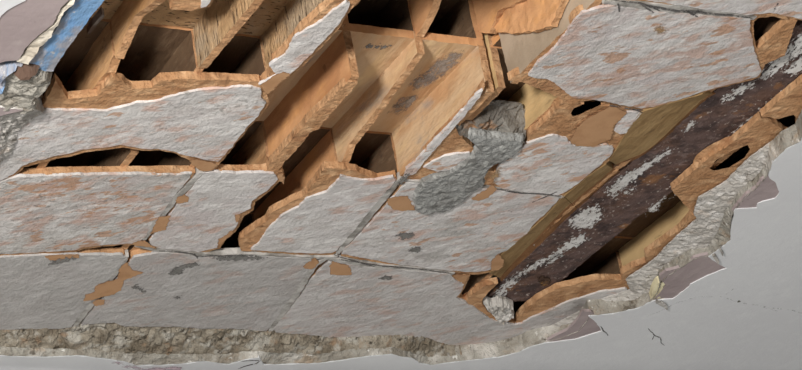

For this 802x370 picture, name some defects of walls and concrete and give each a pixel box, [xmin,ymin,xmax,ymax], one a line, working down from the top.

crack [615,0,752,19]
peeling [0,0,69,95]
spalling [261,72,290,94]
peeling [722,34,802,102]
crack [175,250,253,258]
spalling [0,105,802,365]